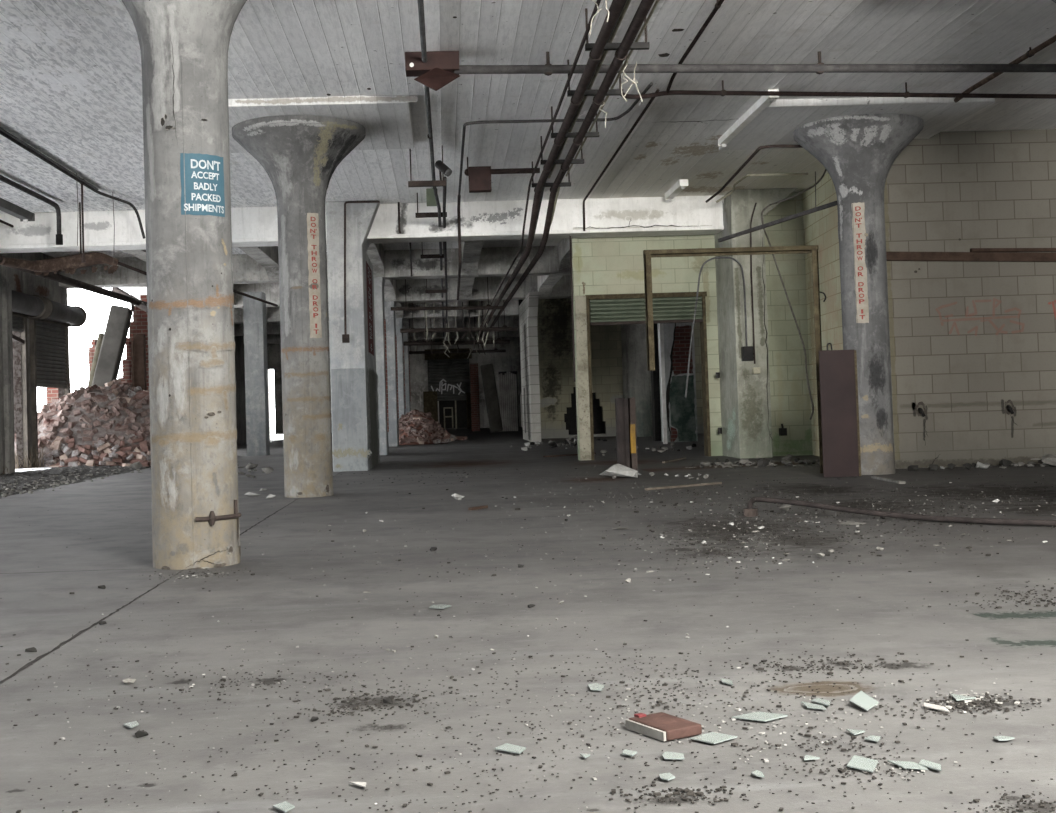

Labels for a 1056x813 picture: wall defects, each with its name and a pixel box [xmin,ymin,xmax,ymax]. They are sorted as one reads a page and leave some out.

peeling [795,115,893,241]
peeling [243,119,359,337]
water stain [864,226,879,280]
peeling [353,278,362,315]
peeling [329,307,362,365]
peeling [669,325,696,442]
peeling [288,443,302,497]